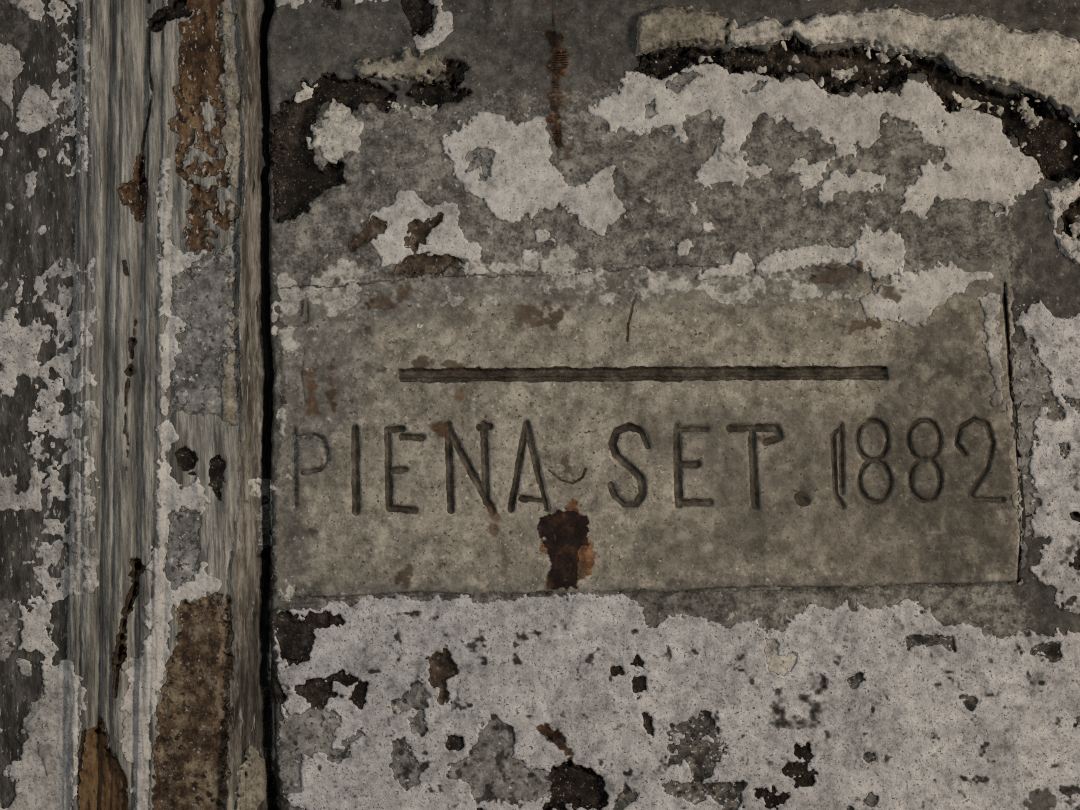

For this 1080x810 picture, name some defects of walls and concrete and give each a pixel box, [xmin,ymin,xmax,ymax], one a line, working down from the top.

peeling [275,0,342,10]
spalling [269,54,471,223]
peeling [402,0,454,52]
rust [540,0,573,158]
peeling [271,112,1080,614]
peeling [248,478,277,551]
rust [538,499,596,590]
peeling [233,592,1080,810]